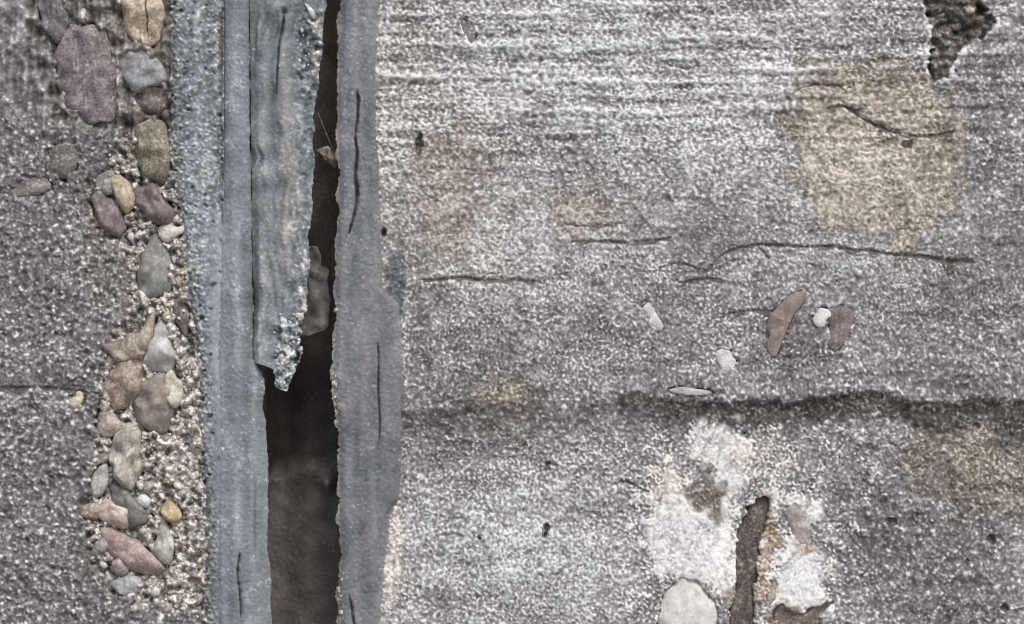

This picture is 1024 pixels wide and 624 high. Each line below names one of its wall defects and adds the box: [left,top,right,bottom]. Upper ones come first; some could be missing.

crack [276,15,285,92]
spalling [923,0,996,81]
crack [797,83,952,139]
crack [349,91,359,233]
leakage [774,54,970,260]
crack [567,224,965,285]
leakage [514,386,1024,624]